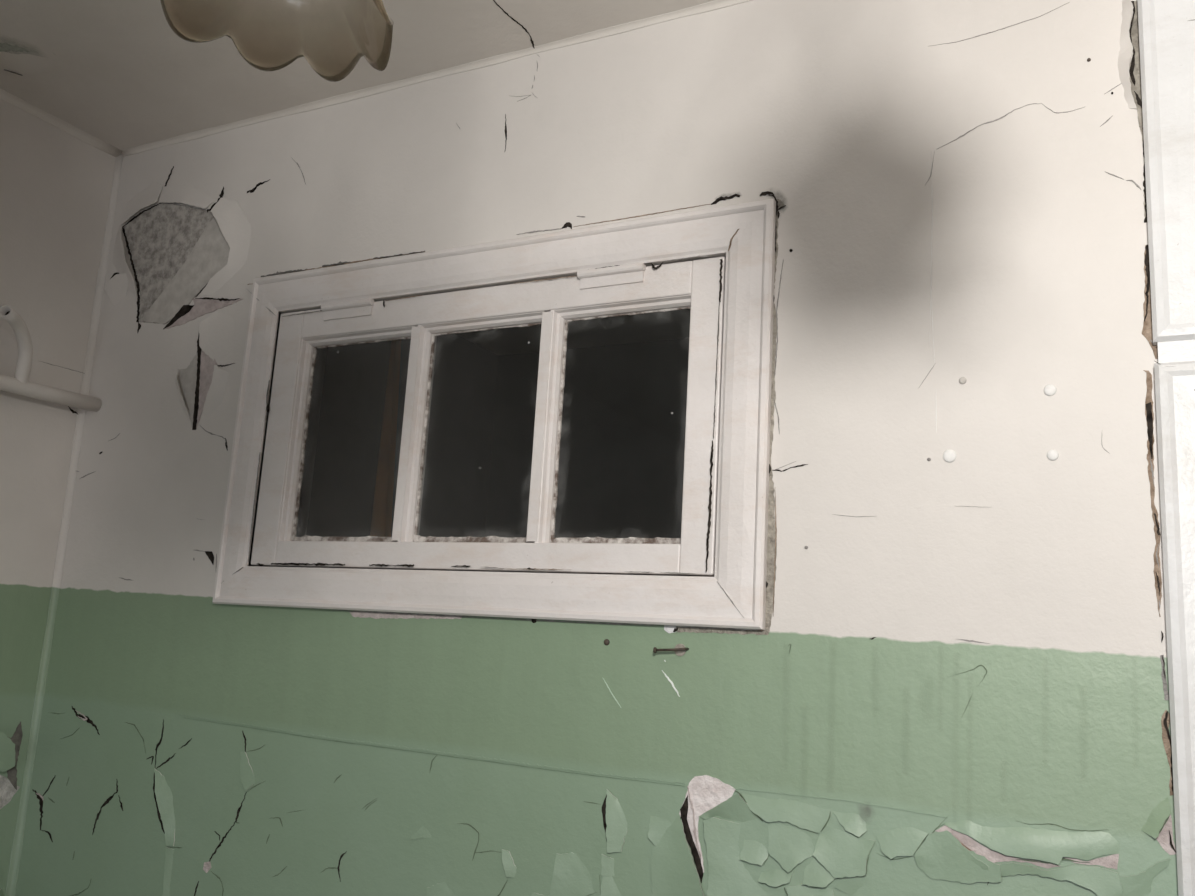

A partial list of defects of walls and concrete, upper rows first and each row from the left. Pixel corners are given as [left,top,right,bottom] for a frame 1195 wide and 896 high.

crack [925,84,1120,185]
peeling [104,166,425,451]
spalling [232,454,345,575]
peeling [0,722,23,809]
crack [48,706,100,739]
crack [32,775,123,896]
crack [194,731,265,896]
crack [322,851,347,882]
crack [457,823,517,896]
peeling [531,790,628,896]
peeling [648,775,1123,896]